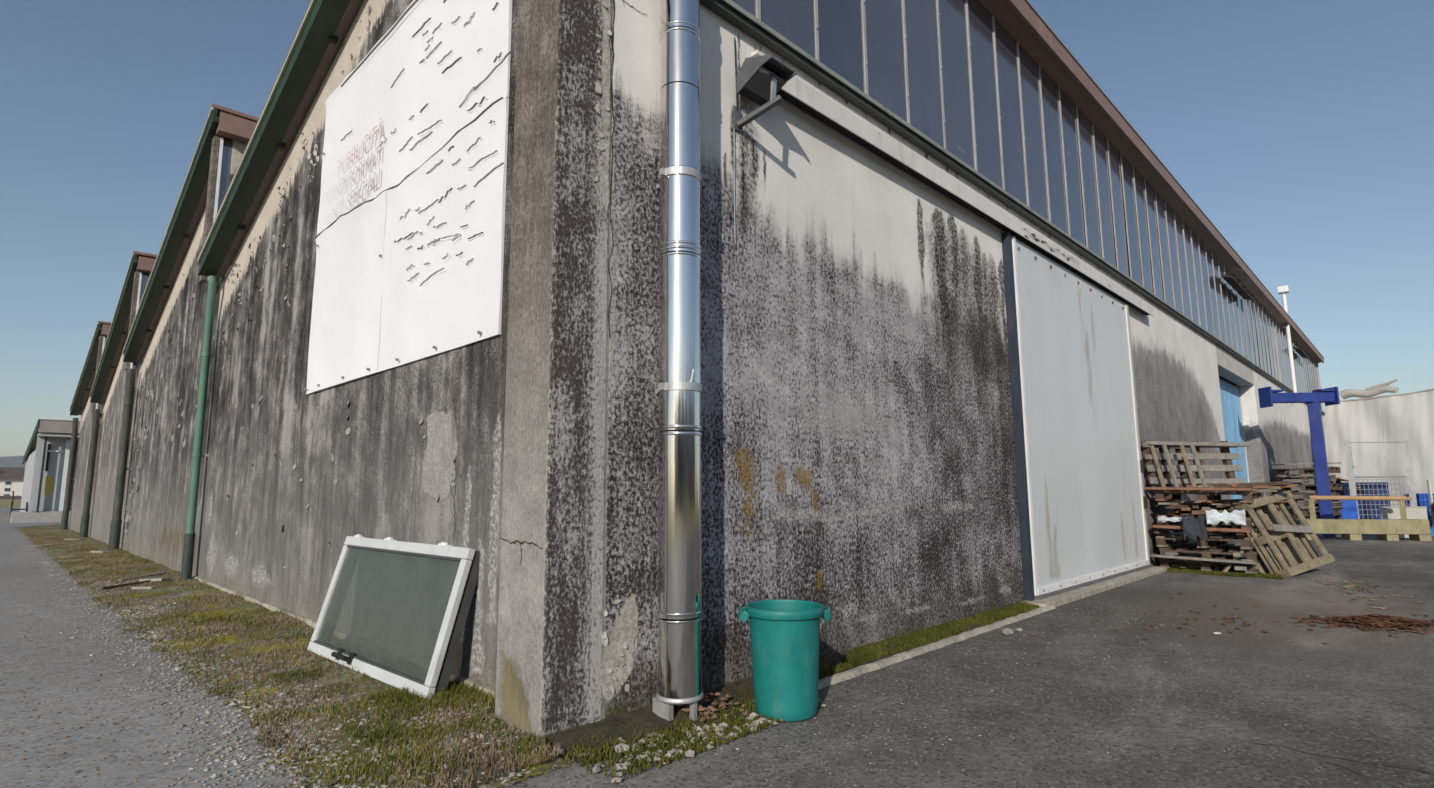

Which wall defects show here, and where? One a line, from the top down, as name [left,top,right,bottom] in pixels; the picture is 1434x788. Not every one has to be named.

damp [723,99,766,217]
damp [917,200,1006,370]
damp [207,495,270,586]
damp [460,416,501,673]
corrosion [776,468,818,524]
damp [775,502,911,522]